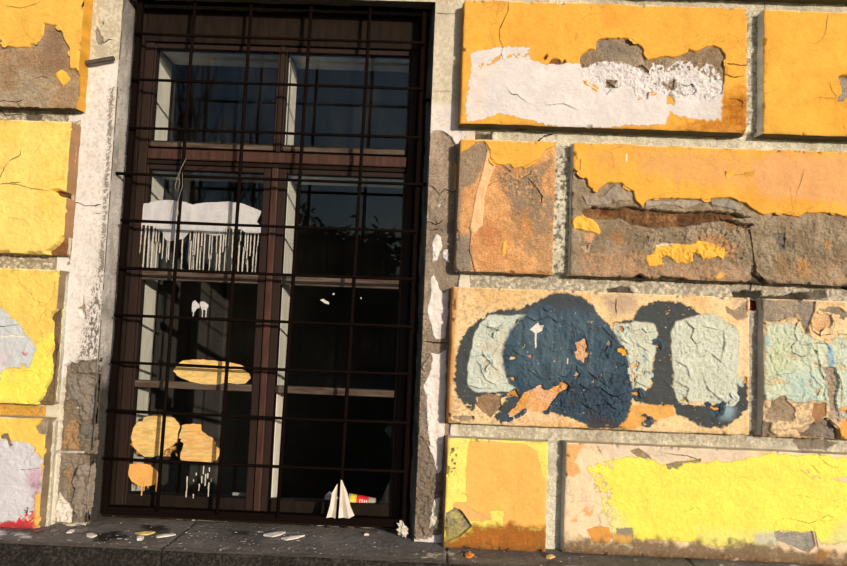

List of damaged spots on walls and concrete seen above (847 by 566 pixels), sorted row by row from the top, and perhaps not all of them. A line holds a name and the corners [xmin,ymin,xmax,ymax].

peeling [0,25,80,121]
spalling [580,35,728,102]
spalling [837,77,847,104]
crack [0,139,61,191]
spalling [569,169,847,337]
spalling [39,309,103,538]
peeling [414,131,556,540]
peeling [476,325,665,422]
peeling [630,448,650,459]
peeling [642,413,656,428]
spalling [761,396,795,436]
spalling [792,367,847,450]